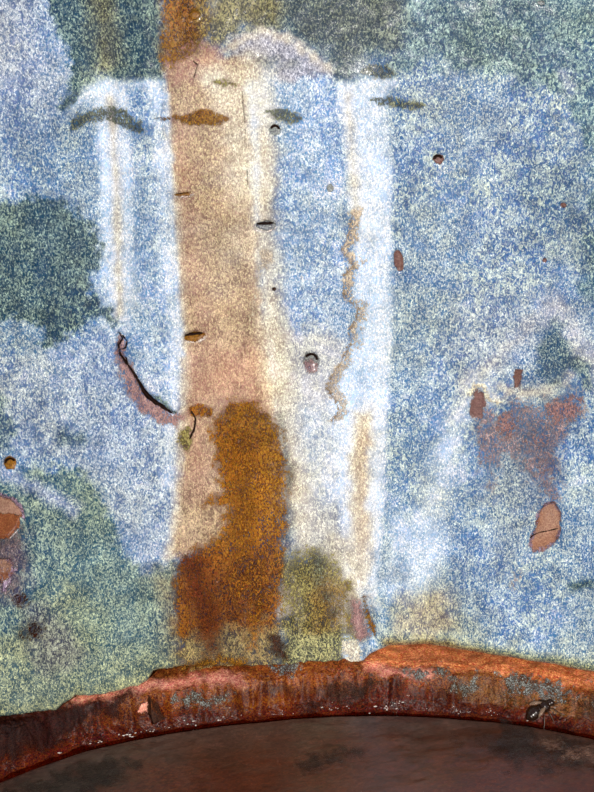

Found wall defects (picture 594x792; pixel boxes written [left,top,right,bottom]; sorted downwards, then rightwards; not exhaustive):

corrosion [159,0,213,69]
spalling [394,250,404,271]
crack [114,332,196,439]
spalling [468,383,501,419]
spalling [0,493,25,539]
corrosion [171,397,292,671]
spalling [528,501,562,553]
spalling [0,558,17,592]